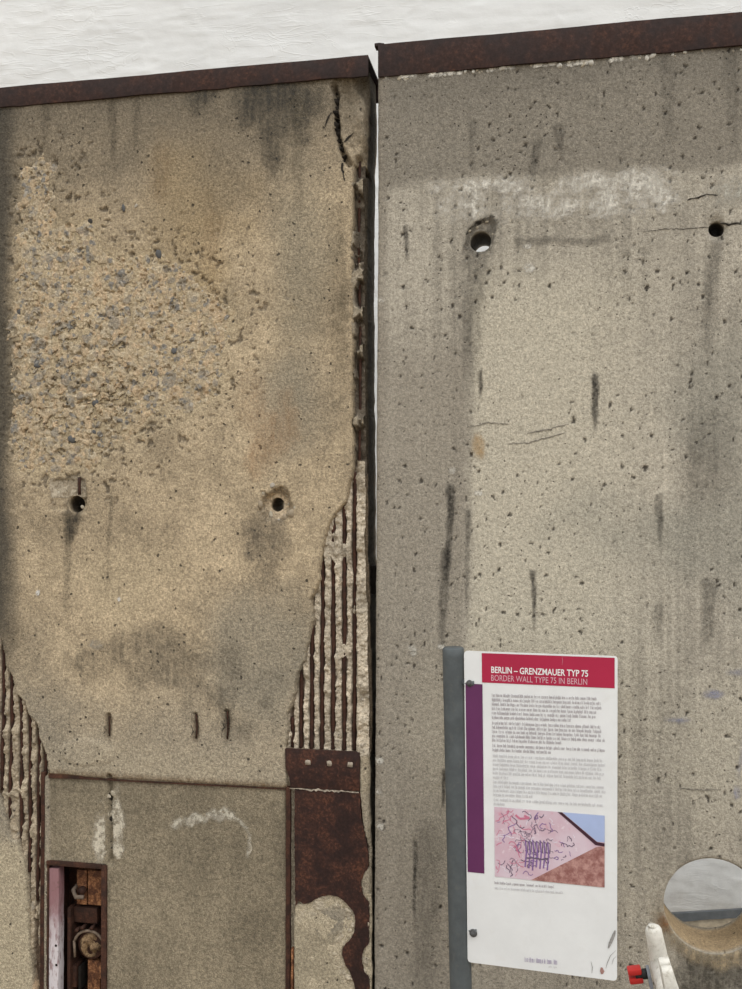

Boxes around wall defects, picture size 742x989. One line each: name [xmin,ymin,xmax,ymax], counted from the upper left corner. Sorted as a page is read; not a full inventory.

crack [325,93,353,181]
crack [644,222,742,232]
spalling [287,161,370,757]
water stain [443,486,454,570]
spalling [0,638,49,983]